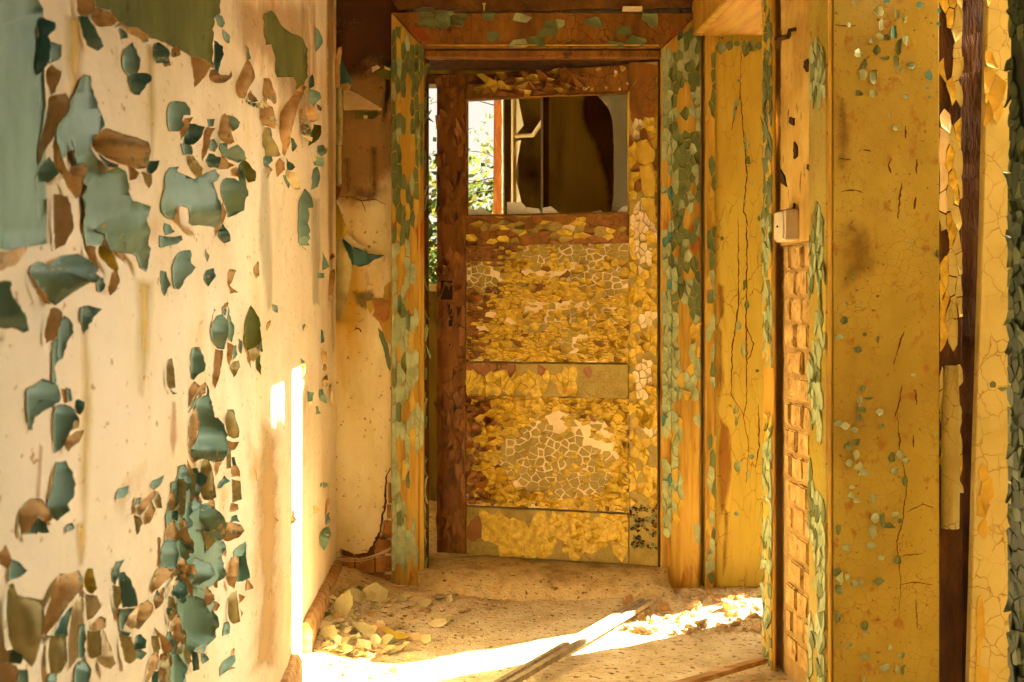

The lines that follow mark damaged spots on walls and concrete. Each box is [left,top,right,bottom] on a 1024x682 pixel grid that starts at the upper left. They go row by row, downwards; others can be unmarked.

crack [367,468,391,554]
peeling [0,0,787,682]
crack [731,51,760,482]
peeling [803,37,826,111]
spalling [734,201,905,682]
crack [839,126,918,217]
peeling [888,450,910,486]
peeling [855,0,964,352]
crack [894,387,933,627]
peeling [975,0,1024,682]